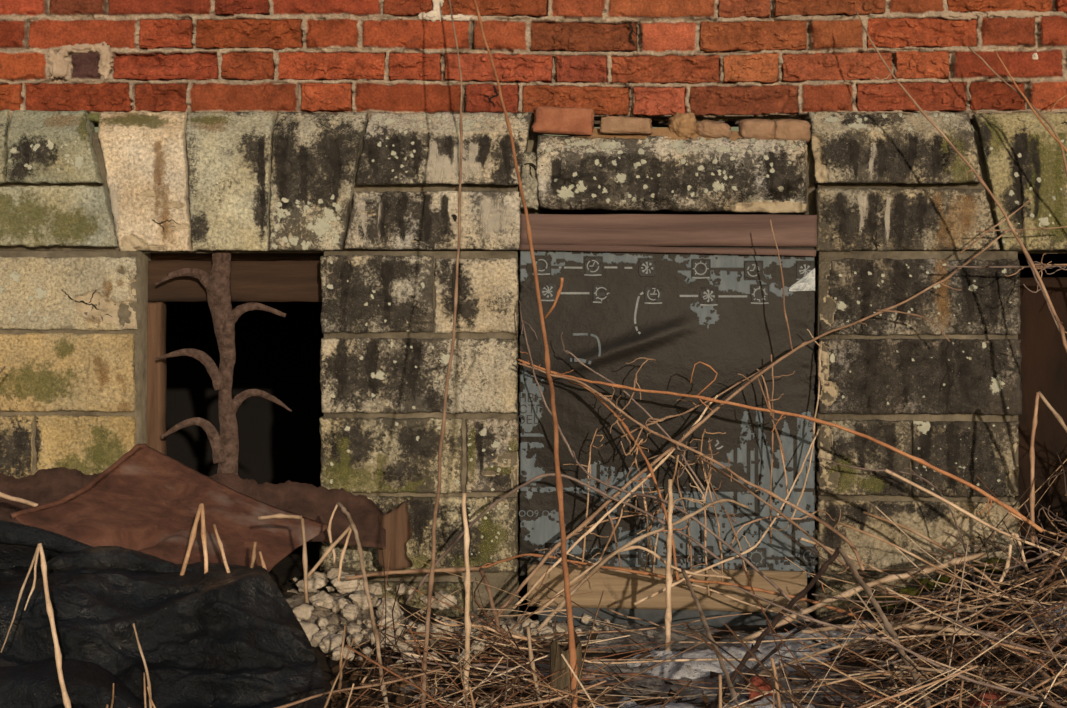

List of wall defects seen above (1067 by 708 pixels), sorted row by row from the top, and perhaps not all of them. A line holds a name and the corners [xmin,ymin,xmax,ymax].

spalling [0,0,1067,116]
leakage [8,134,59,181]
leakage [191,211,209,243]
leakage [546,150,806,209]
leakage [999,118,1065,234]
leakage [239,112,525,489]
leakage [815,112,1019,559]
leakage [373,498,491,568]